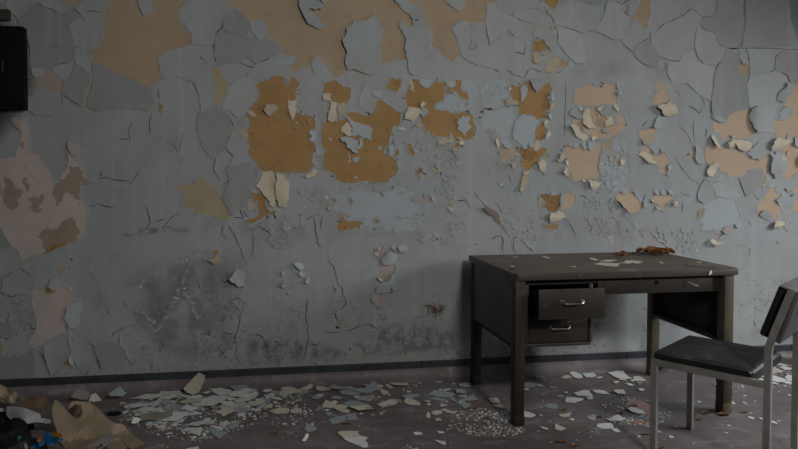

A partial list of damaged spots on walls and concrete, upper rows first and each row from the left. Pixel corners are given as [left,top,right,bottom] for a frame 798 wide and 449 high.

peeling [0,114,98,352]
crack [0,326,135,379]
crack [4,0,292,265]
crack [297,212,379,359]
peeling [225,0,678,284]
crack [451,187,535,253]
crack [460,0,798,248]
peeling [695,197,744,246]
peeling [685,82,798,229]